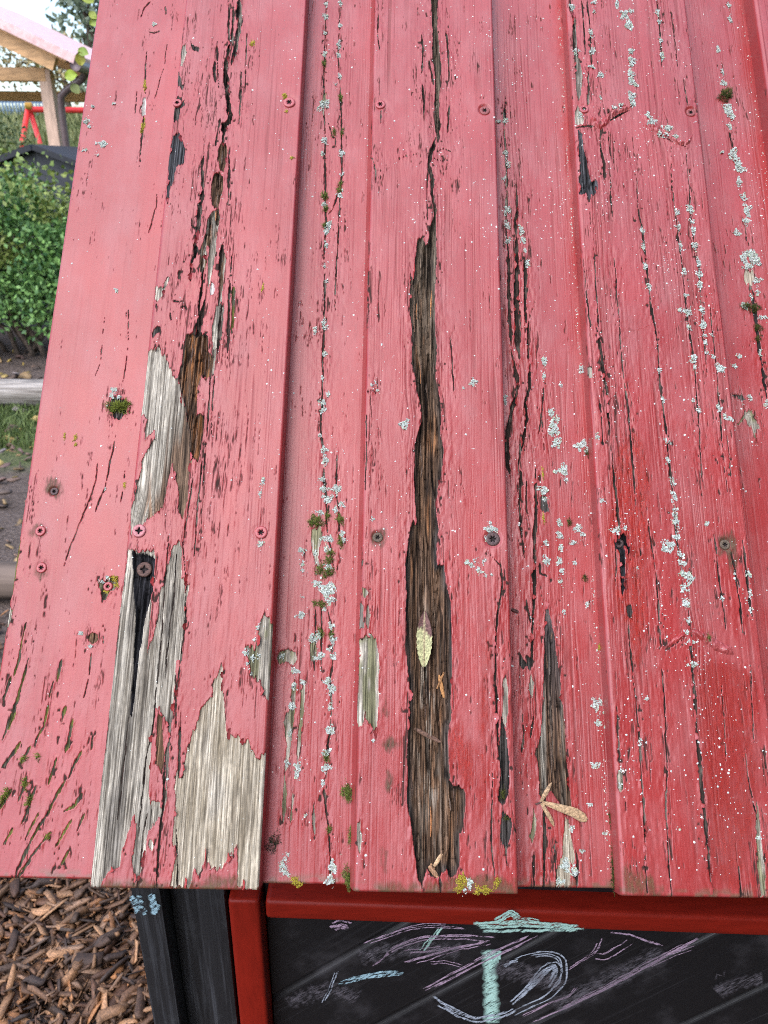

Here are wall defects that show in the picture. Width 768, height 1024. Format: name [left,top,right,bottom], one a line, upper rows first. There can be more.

peeling [131,326,192,534]
peeling [155,277,169,310]
crack [169,0,248,776]
crack [488,98,579,888]
crack [0,622,104,878]
peeling [91,541,266,890]
peeling [245,616,297,700]
peeling [282,681,305,822]
peeling [357,588,380,738]